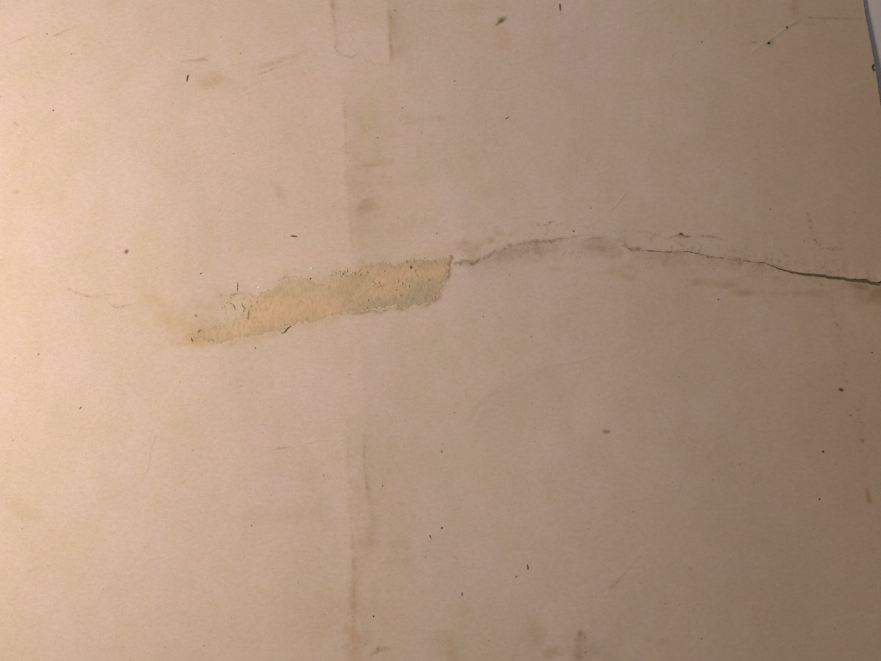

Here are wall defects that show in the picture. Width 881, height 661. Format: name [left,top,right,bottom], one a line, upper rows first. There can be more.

peeling [191,257,452,344]